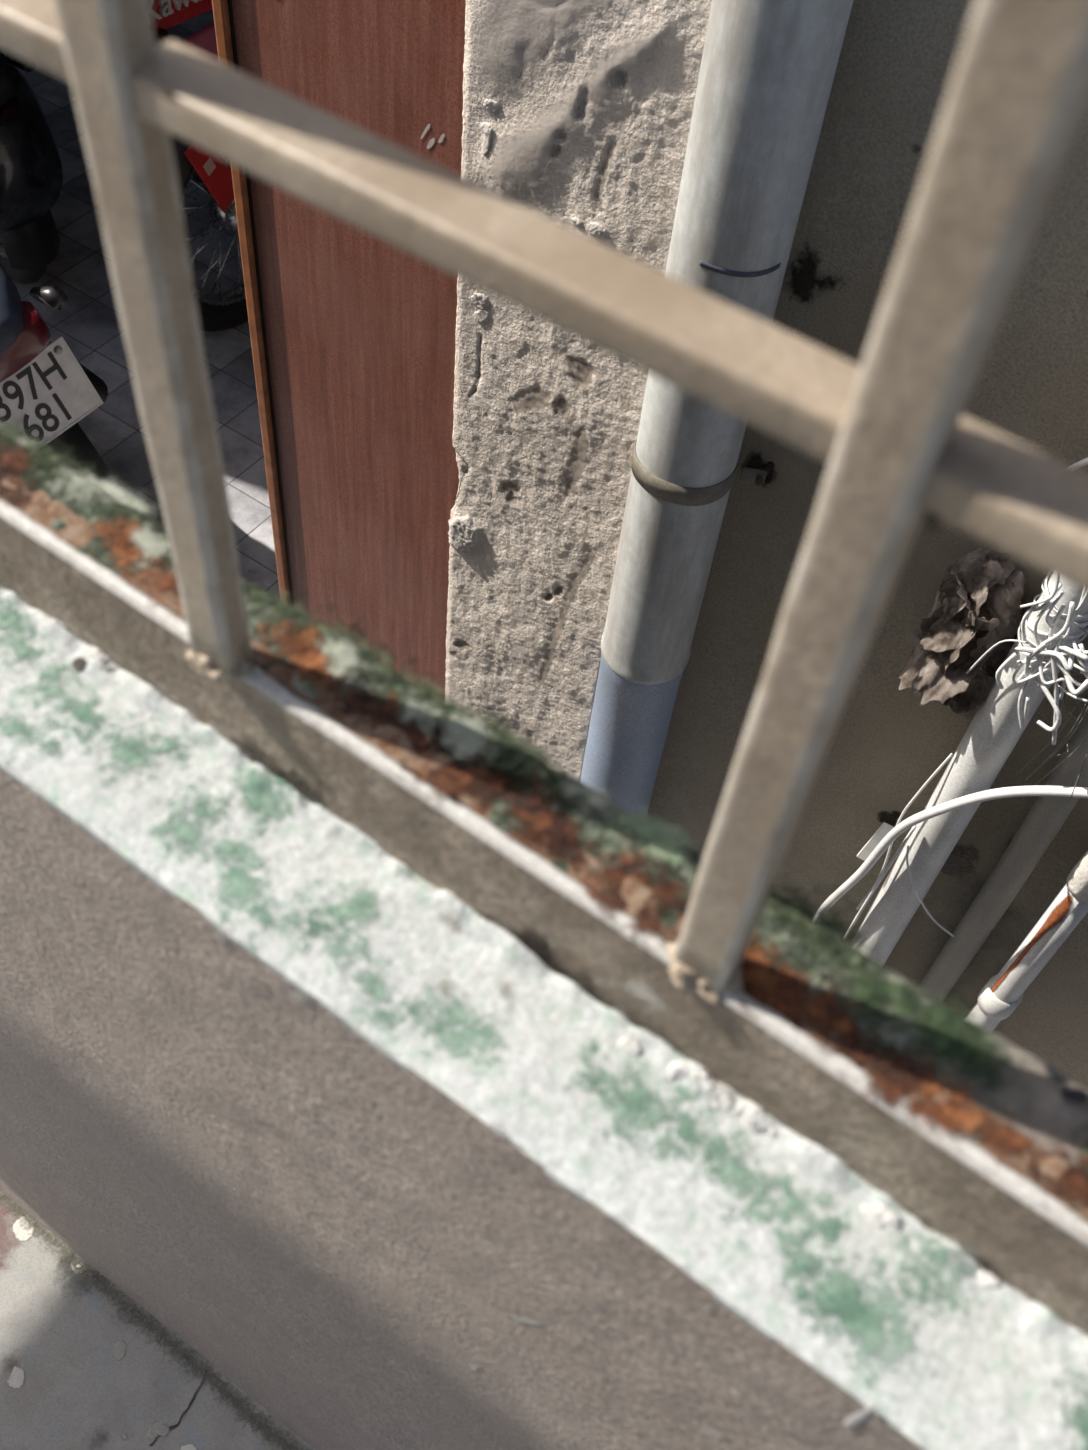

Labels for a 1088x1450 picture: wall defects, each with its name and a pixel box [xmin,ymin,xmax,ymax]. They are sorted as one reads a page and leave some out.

peeling [480,99,499,156]
hole [577,89,590,119]
peeling [471,293,490,323]
spalling [512,358,593,494]
spalling [503,482,518,503]
leakage [321,636,368,677]
leakage [401,699,496,759]
leakage [565,776,698,865]
corrosion [991,895,1072,992]
leakage [1044,1061,1088,1103]